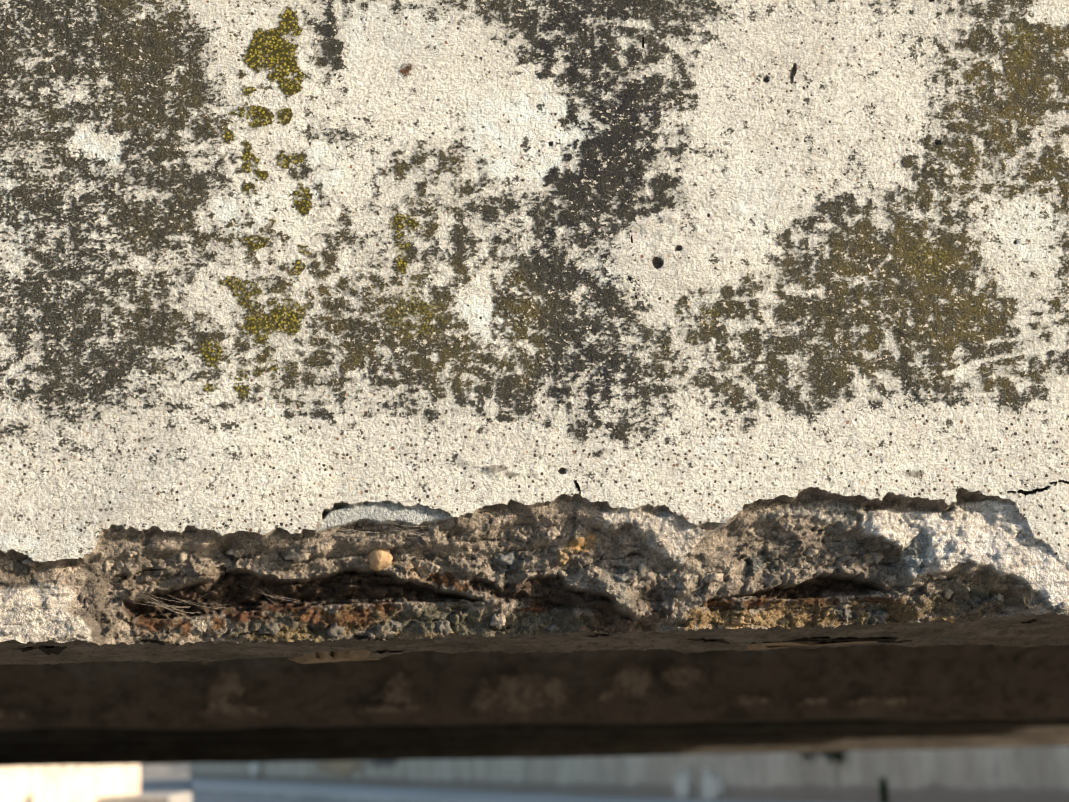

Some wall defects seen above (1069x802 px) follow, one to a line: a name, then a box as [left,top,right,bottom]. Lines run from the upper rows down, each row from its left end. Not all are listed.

leakage [300,0,355,86]
leakage [0,0,229,442]
leakage [487,0,889,456]
crack [1007,480,1069,496]
corrosion [424,572,470,592]
spalling [0,487,1069,664]
corrosion [701,595,903,610]